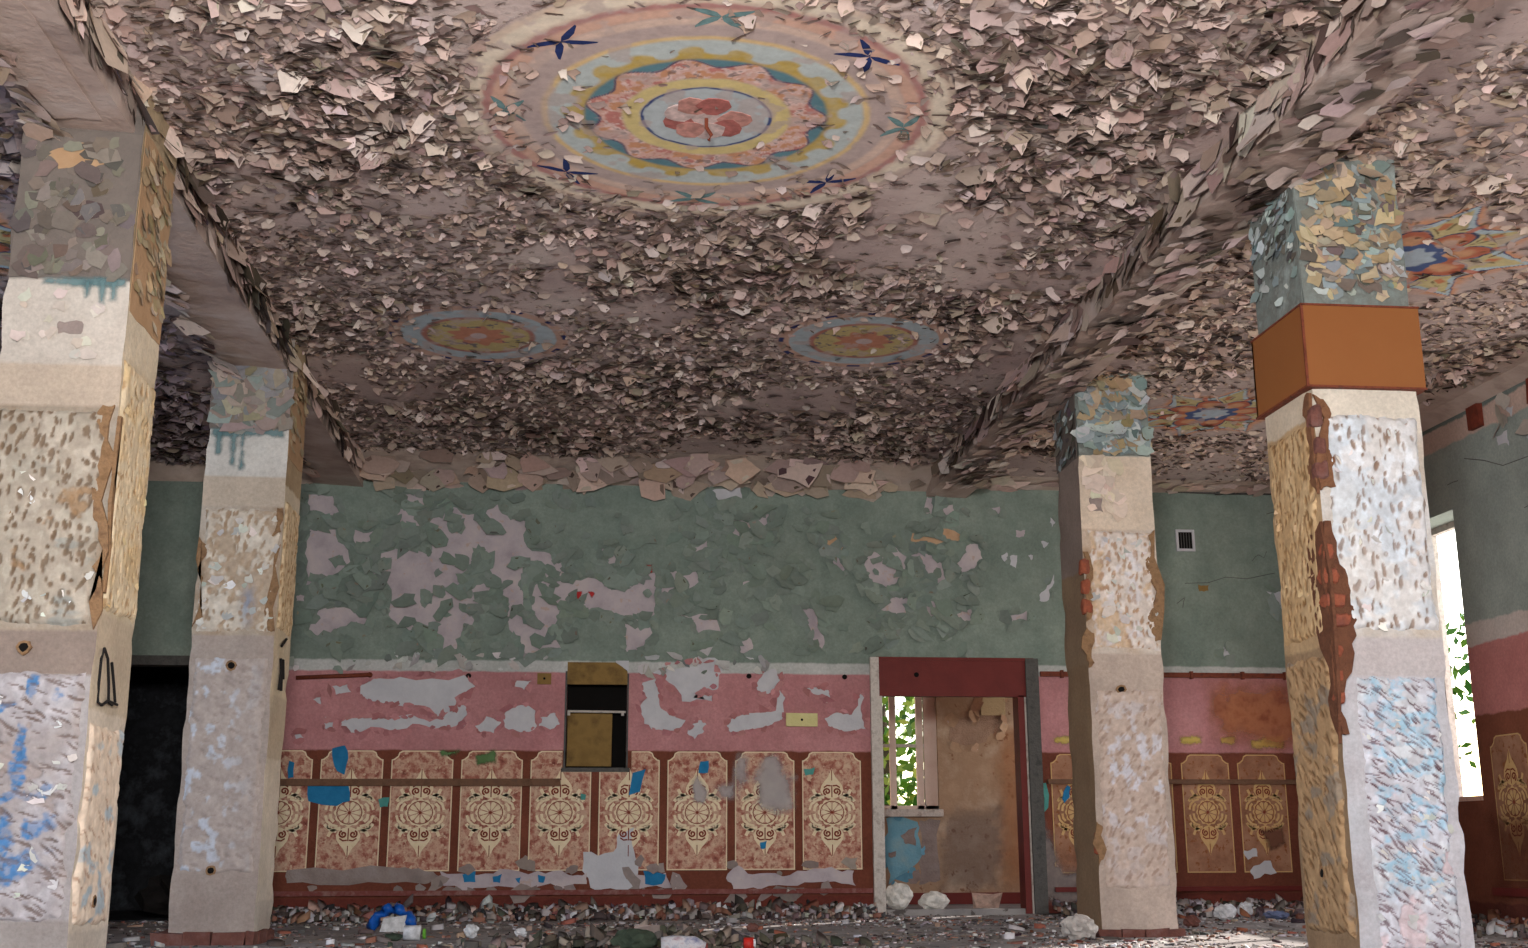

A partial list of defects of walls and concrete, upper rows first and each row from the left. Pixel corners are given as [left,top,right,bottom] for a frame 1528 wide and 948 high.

peeling [0,0,1528,745]
spalling [177,657,268,876]
peeling [285,855,587,903]
peeling [622,855,687,899]
peeling [724,857,858,903]
spalling [1092,685,1170,889]
water stain [1212,687,1293,749]
spalling [1265,393,1439,939]
spalling [1356,676,1461,948]